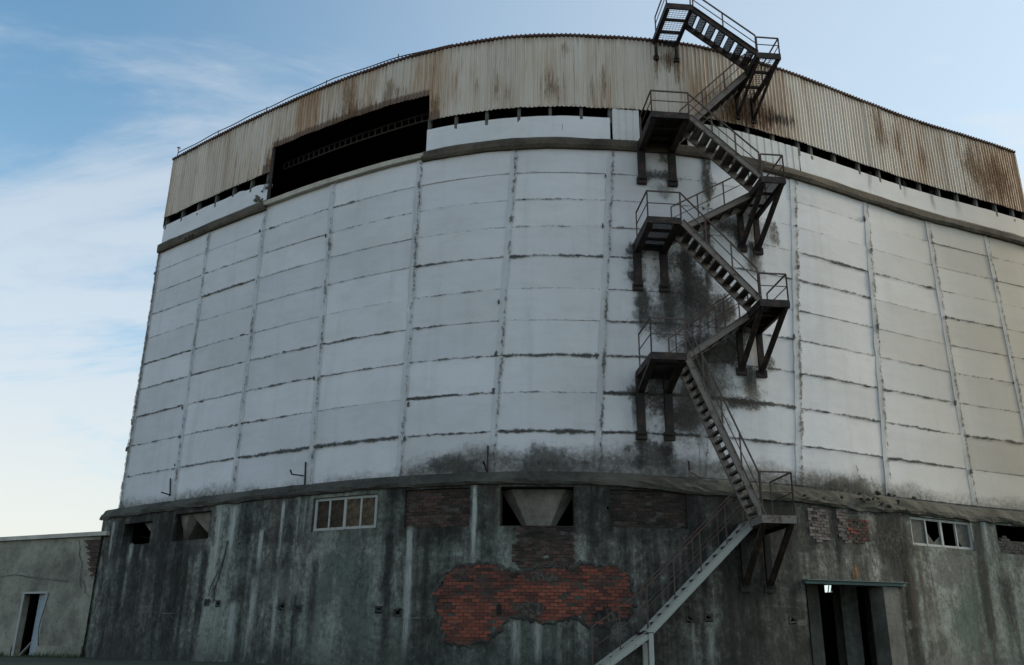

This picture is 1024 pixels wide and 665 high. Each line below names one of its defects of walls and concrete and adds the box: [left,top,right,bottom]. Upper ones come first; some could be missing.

damp [702,158,716,199]
rust [962,145,1023,203]
spalling [864,204,880,354]
damp [627,217,775,435]
peeling [793,251,916,544]
damp [428,453,476,474]
damp [523,443,590,473]
damp [624,438,676,469]
flaking render [79,539,101,594]
damp [194,506,238,631]
damp [246,579,259,641]
flaking render [432,526,638,650]